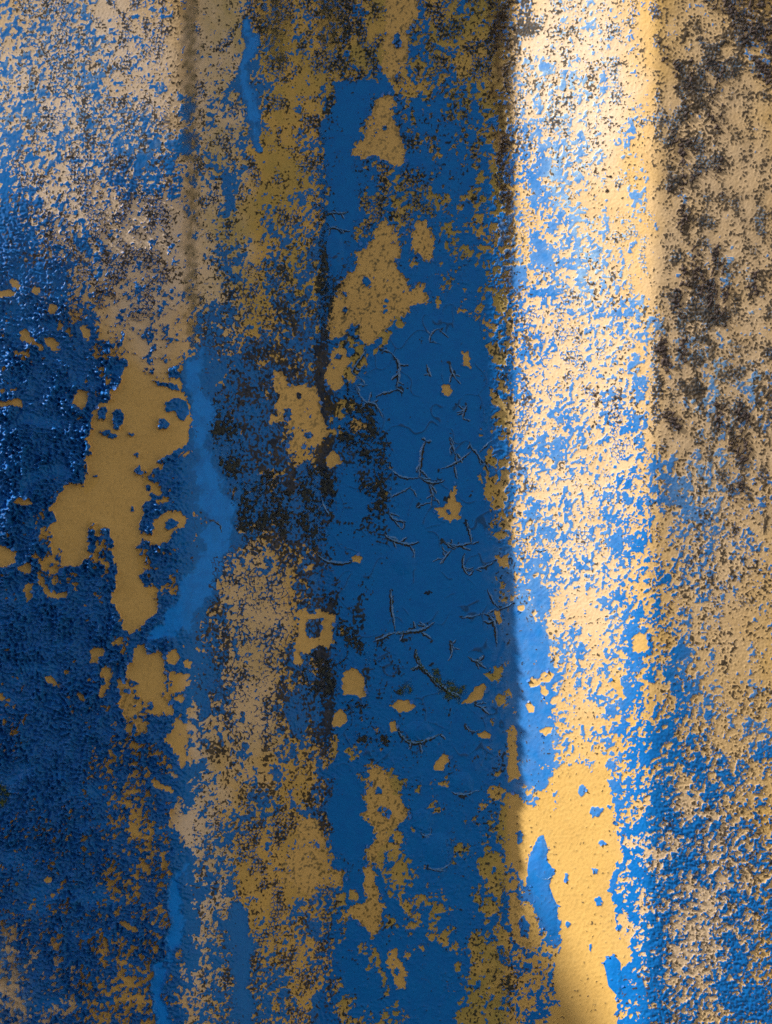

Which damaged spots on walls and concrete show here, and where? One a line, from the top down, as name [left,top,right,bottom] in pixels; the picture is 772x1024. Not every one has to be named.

peeling [269,216,435,469]
peeling [48,367,193,634]
crack [317,553,351,568]
crack [351,329,514,754]
peeling [90,644,195,768]
peeling [290,609,337,665]
peeling [526,669,554,712]
peeling [632,632,650,653]
peeling [337,761,412,939]
crack [452,789,479,797]
peeling [505,725,633,1024]
peeling [385,948,408,989]